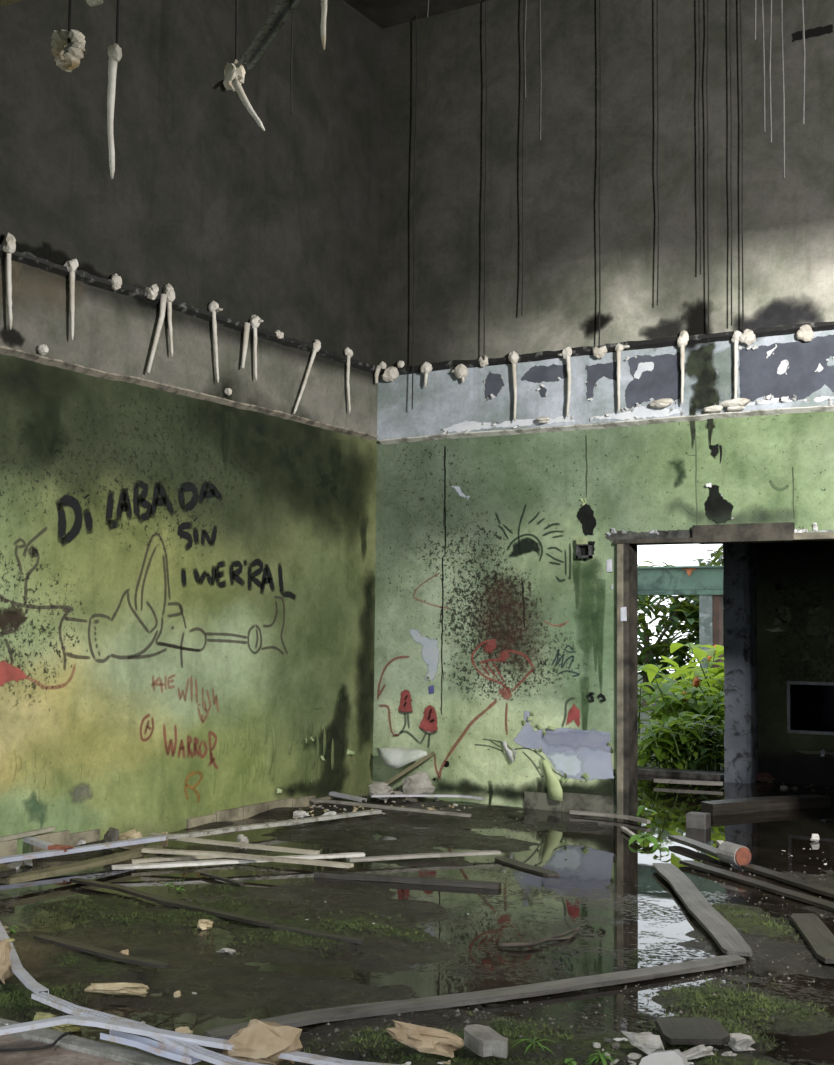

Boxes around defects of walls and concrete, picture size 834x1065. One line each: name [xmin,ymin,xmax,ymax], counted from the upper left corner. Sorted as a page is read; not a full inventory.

peeling [483,372,504,401]
peeling [521,364,567,397]
peeling [585,352,684,421]
peeling [738,335,834,406]
spalling [442,414,575,434]
water stain [0,602,31,639]
water stain [276,577,375,798]
peeling [502,711,615,801]